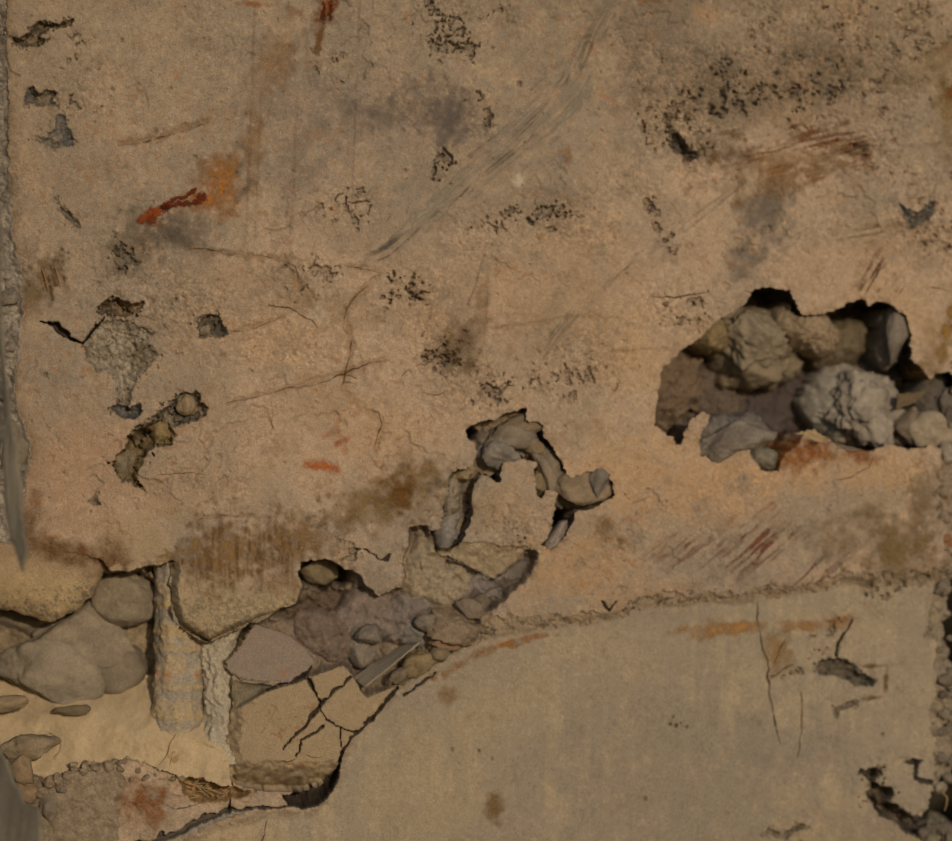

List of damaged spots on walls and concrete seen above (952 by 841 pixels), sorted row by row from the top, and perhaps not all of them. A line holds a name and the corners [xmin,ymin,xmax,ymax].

rust [313,0,338,54]
rust [137,156,239,223]
crack [42,317,105,345]
spalling [81,317,209,430]
flaking render [724,308,793,389]
flaking render [481,413,613,506]
spalling [824,305,952,841]
peeling [226,624,314,683]
crack [266,665,437,764]
crack [756,601,803,759]
crack [137,799,290,841]
peeling [179,767,257,804]